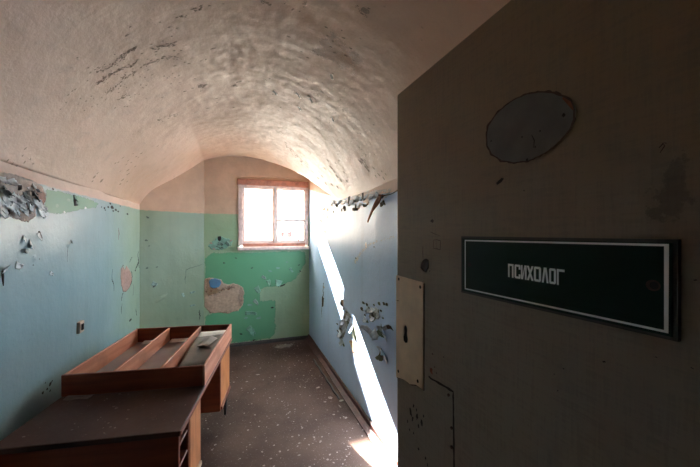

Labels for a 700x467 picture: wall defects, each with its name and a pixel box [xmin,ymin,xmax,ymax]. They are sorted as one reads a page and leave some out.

peeling [0,147,66,222]
peeling [323,188,391,213]
spalling [121,265,134,314]
spalling [204,278,258,314]
peeling [336,301,388,353]